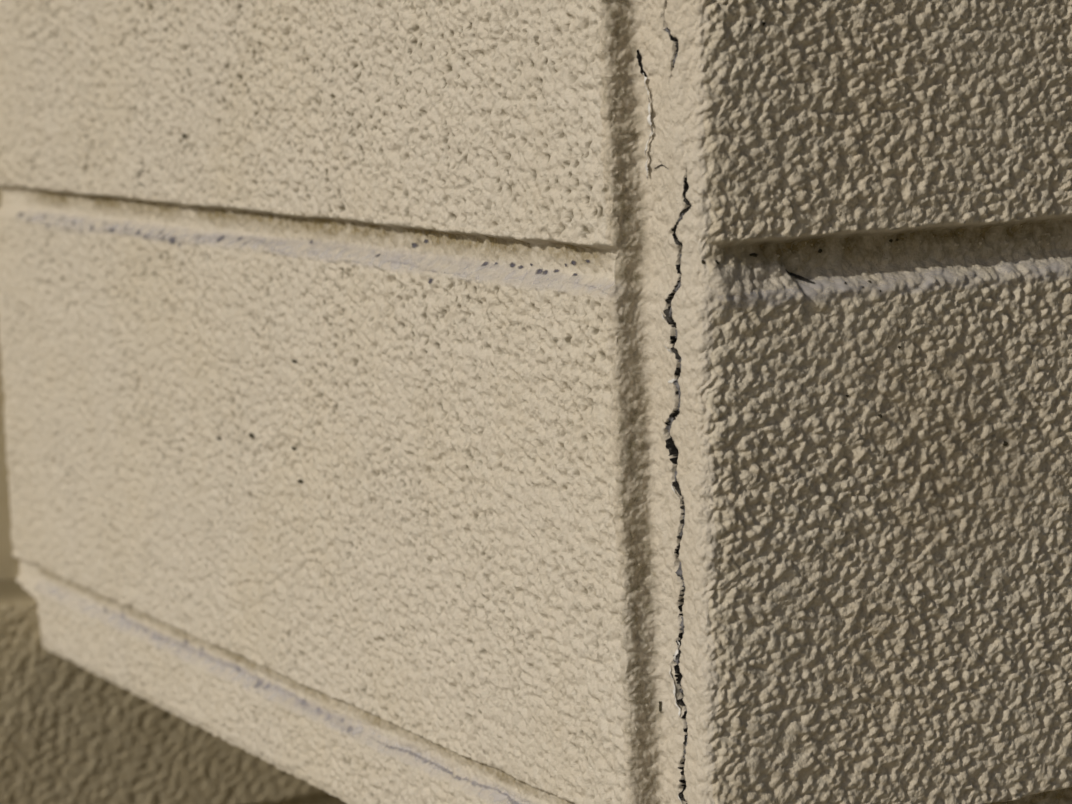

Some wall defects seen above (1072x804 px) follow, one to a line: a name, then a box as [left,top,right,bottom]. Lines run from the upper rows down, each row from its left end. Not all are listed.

crack [664,1,679,85]
crack [660,170,692,804]